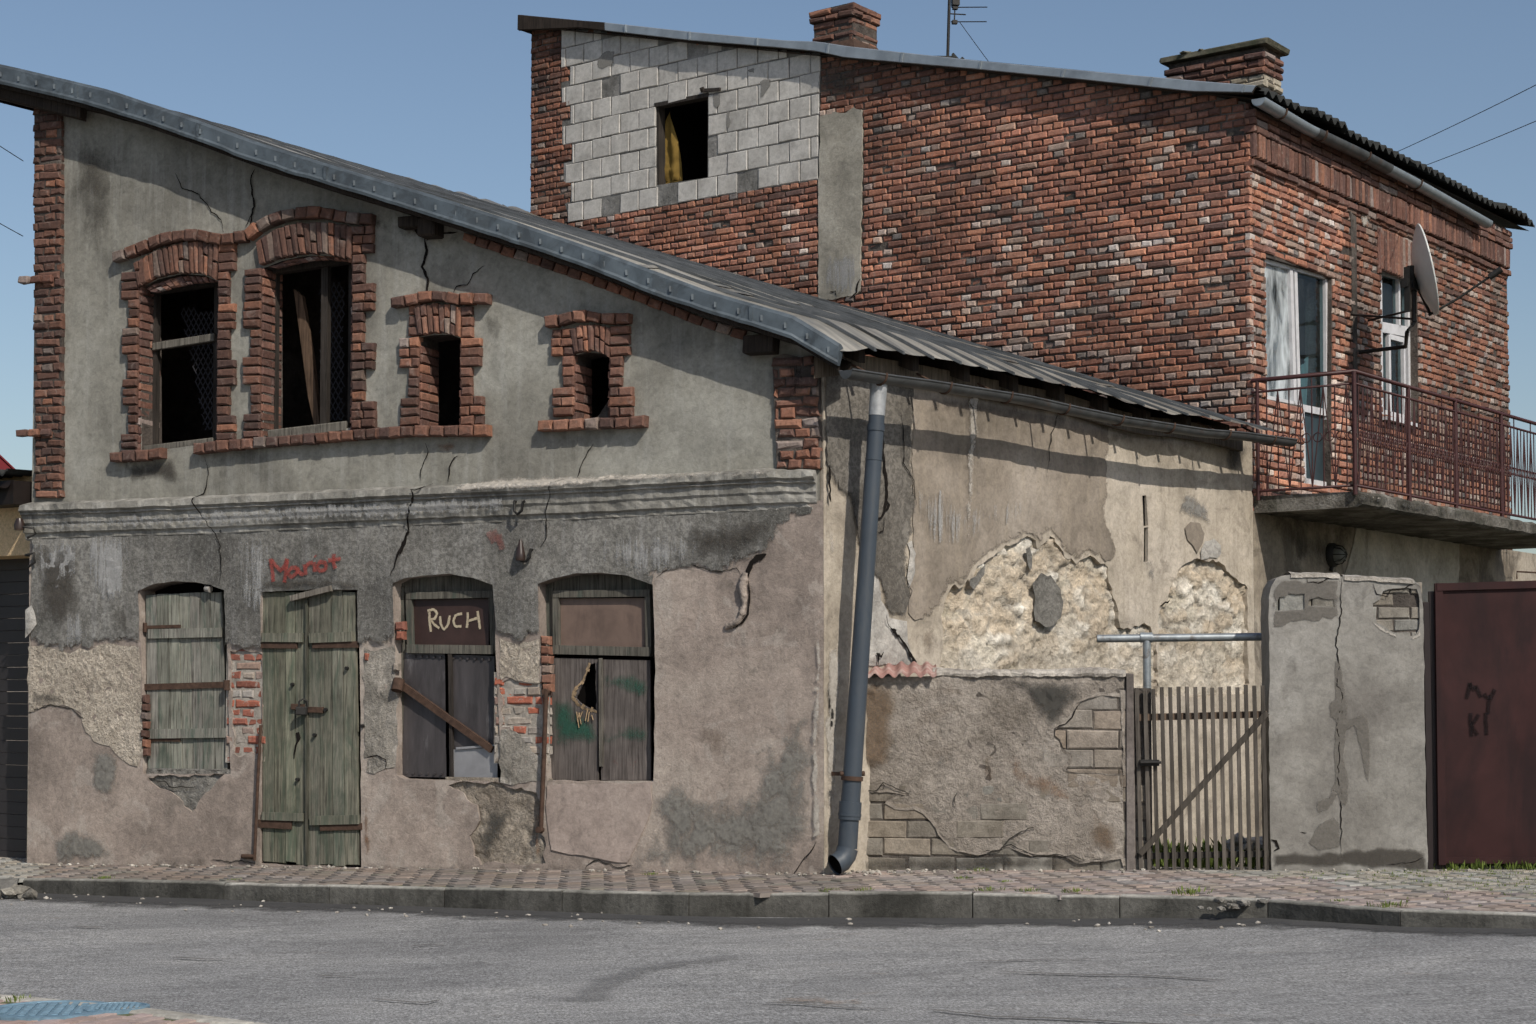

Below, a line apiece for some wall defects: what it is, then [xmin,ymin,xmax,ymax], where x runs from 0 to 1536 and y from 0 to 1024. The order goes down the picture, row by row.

crack [175,169,255,233]
flaking render [25,605,266,815]
crack [390,443,457,575]
flaking render [445,636,555,865]
crack [876,563,917,664]
crack [878,415,917,533]
flaking render [907,541,916,586]
flaking render [939,522,1248,776]
crack [1271,576,1420,851]
flaking render [869,789,1126,866]